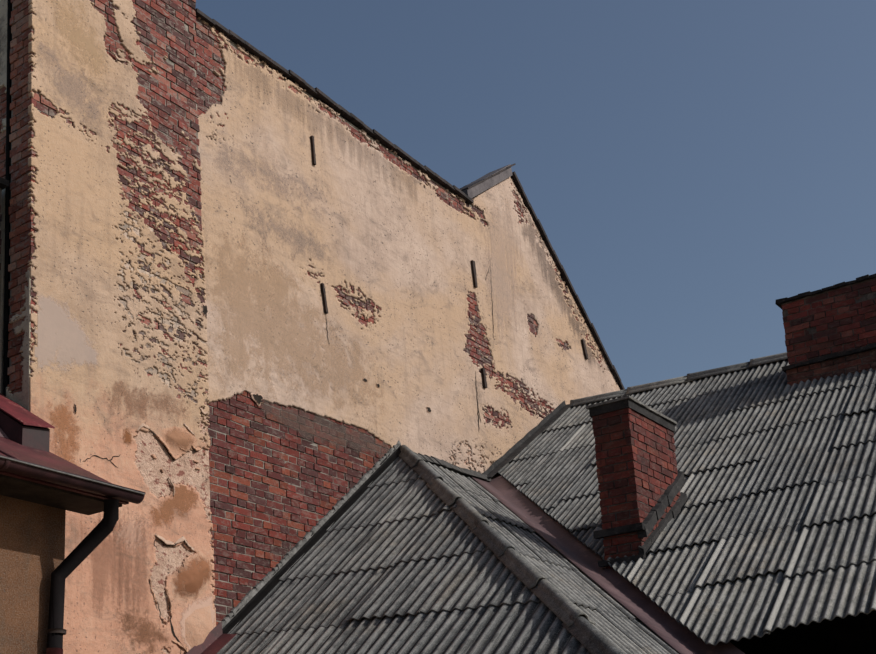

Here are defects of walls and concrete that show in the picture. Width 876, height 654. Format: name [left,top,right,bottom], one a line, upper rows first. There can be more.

spalling [0,0,96,394]
flaking render [90,0,492,626]
spalling [482,406,512,429]
spalling [463,289,554,419]
leakage [125,615,167,652]